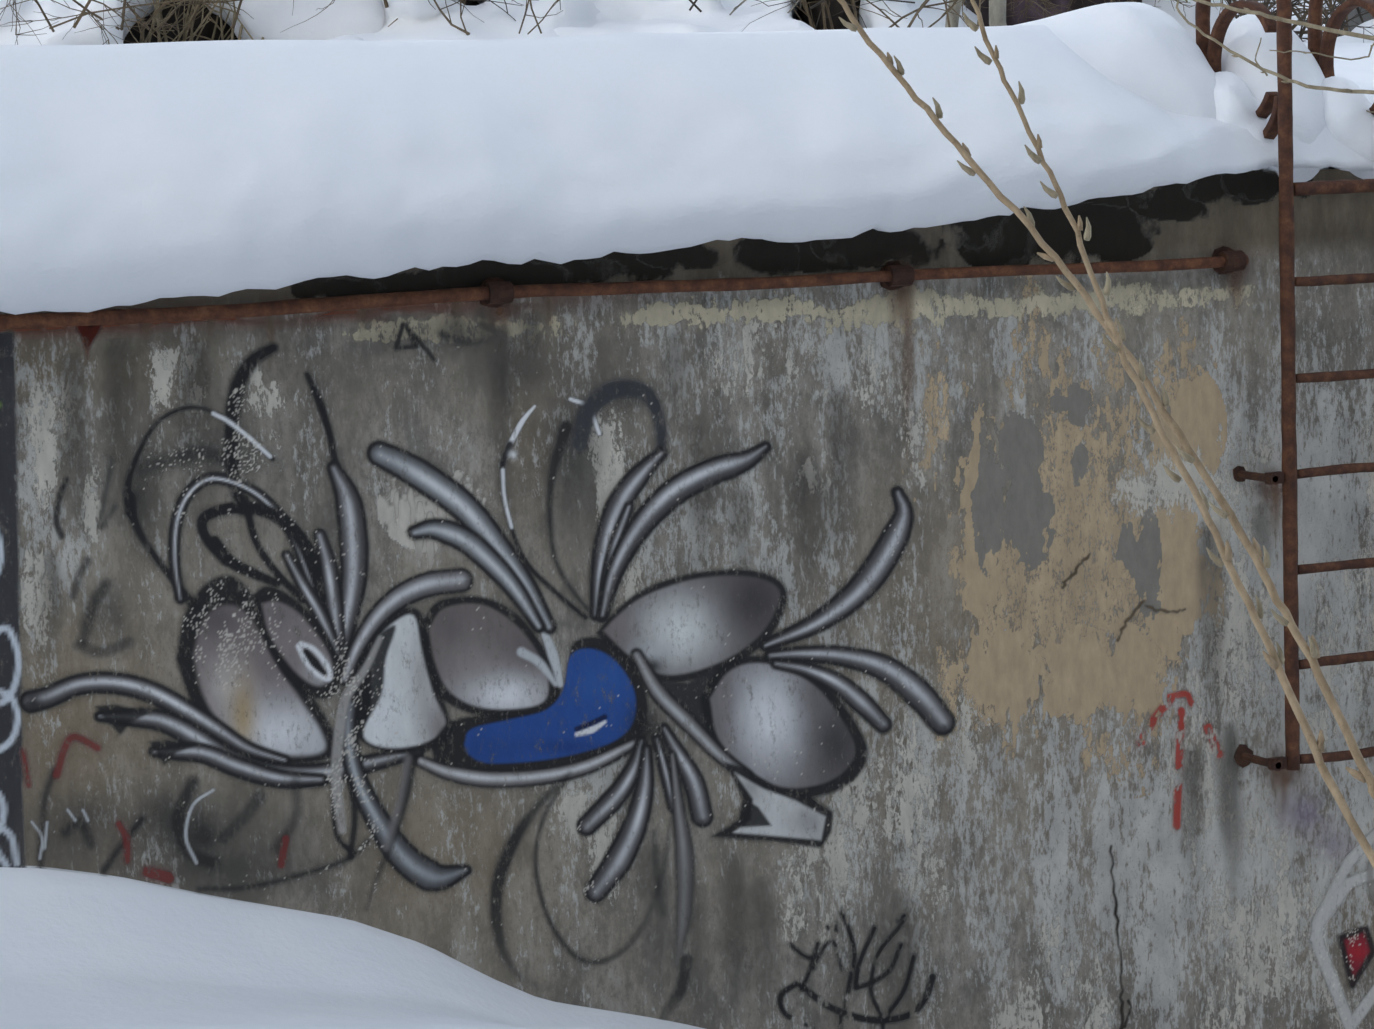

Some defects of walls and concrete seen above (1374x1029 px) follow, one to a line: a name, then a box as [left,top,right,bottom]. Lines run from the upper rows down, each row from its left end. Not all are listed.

crack [1062,554,1090,589]
crack [1116,600,1186,642]
peeling [699,275,1374,1029]